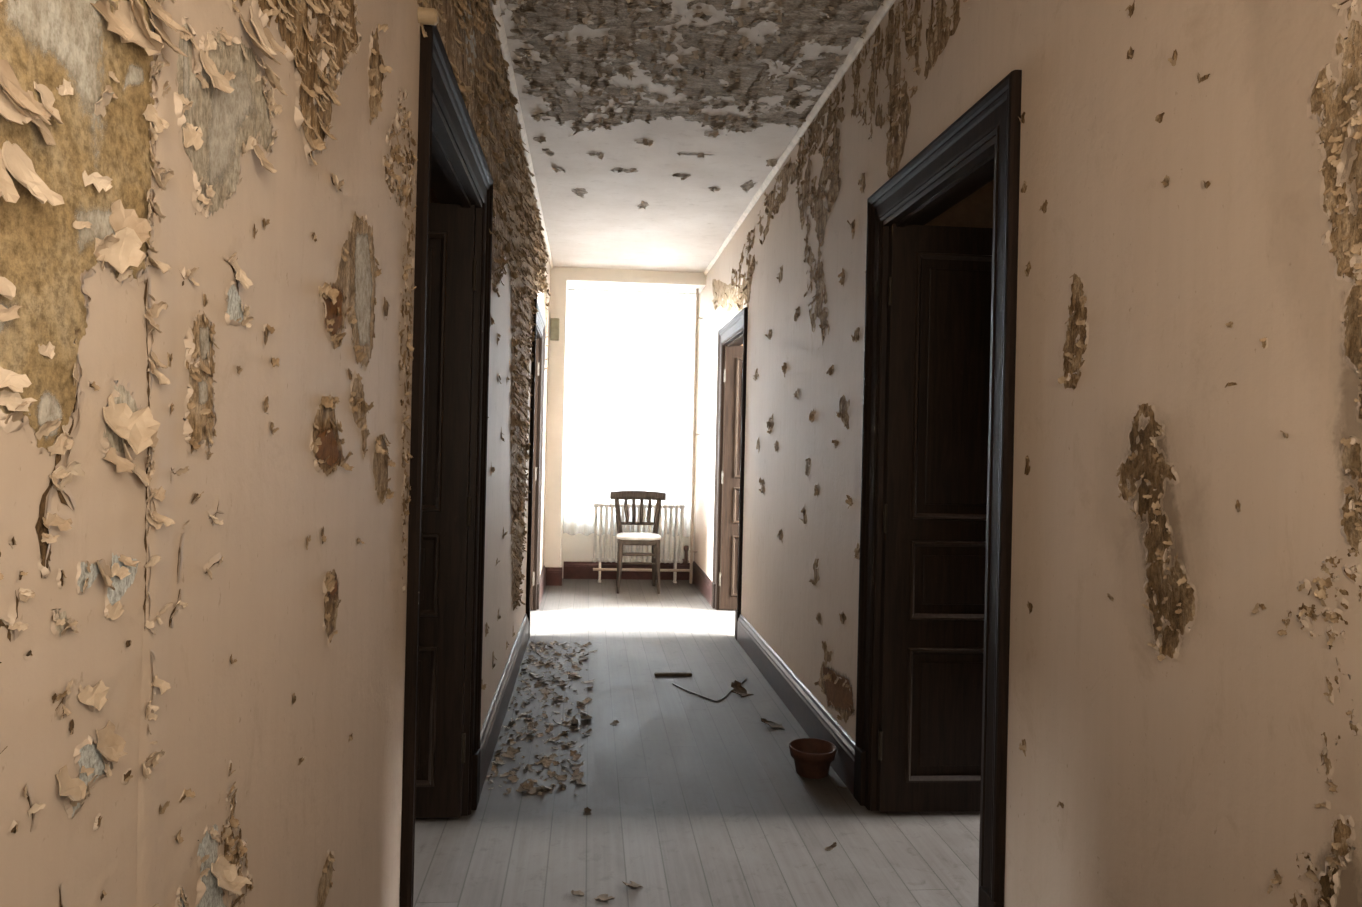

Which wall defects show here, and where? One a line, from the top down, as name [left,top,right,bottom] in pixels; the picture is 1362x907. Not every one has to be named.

peeling [159,788,195,815]
peeling [0,0,418,593]
peeling [173,760,254,907]
peeling [415,0,981,690]
peeling [1116,400,1198,664]
peeling [1252,0,1362,907]